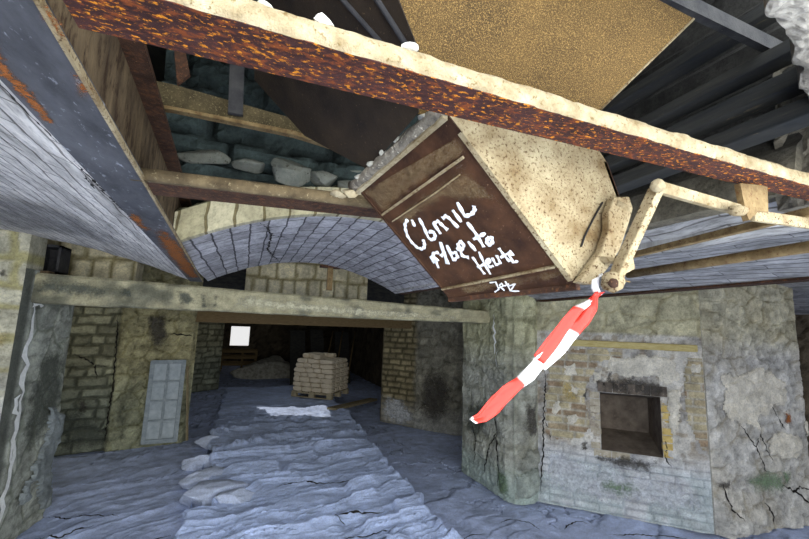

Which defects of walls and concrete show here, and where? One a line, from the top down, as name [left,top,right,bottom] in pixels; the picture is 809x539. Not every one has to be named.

rust [0,55,53,124]
rust [128,214,198,278]
crack [260,223,287,260]
leakage [0,303,106,522]
crack [472,415,499,485]
flaking render [544,347,708,451]
crack [739,408,783,472]
crack [784,485,809,503]
crack [613,531,683,539]